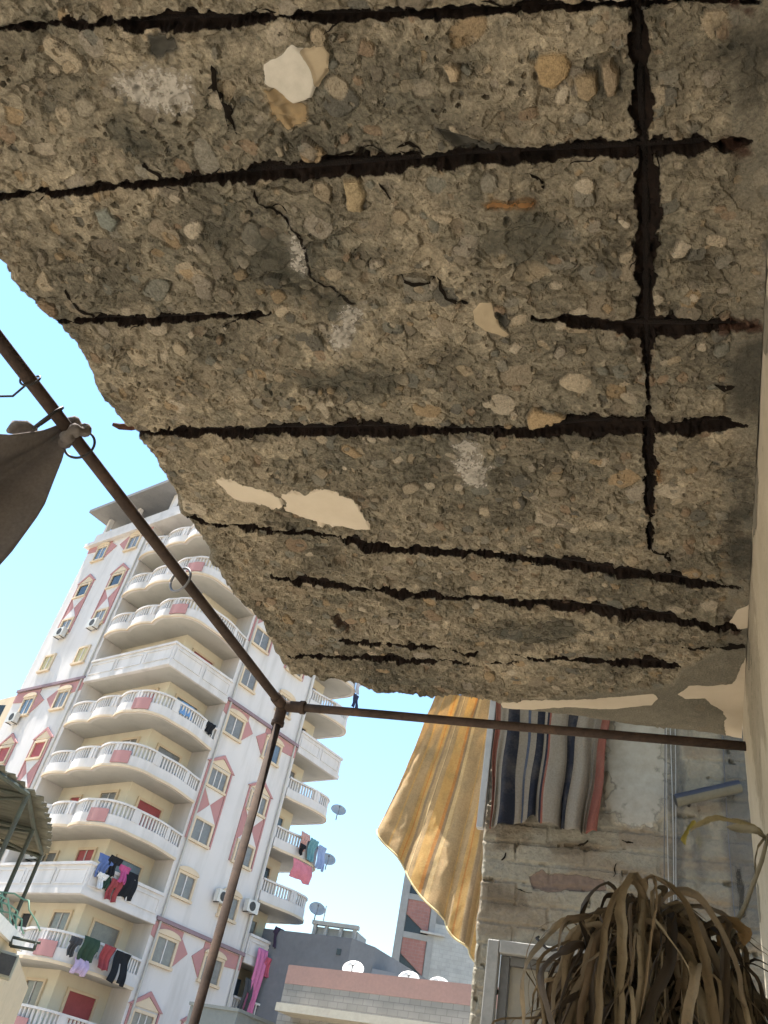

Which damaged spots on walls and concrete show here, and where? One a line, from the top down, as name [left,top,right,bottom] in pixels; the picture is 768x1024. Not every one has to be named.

spalling [264,45,330,130]
crack [0,0,762,590]
spalling [473,302,509,337]
rust [719,316,763,335]
water stain [451,441,492,488]
spalling [530,869,606,893]